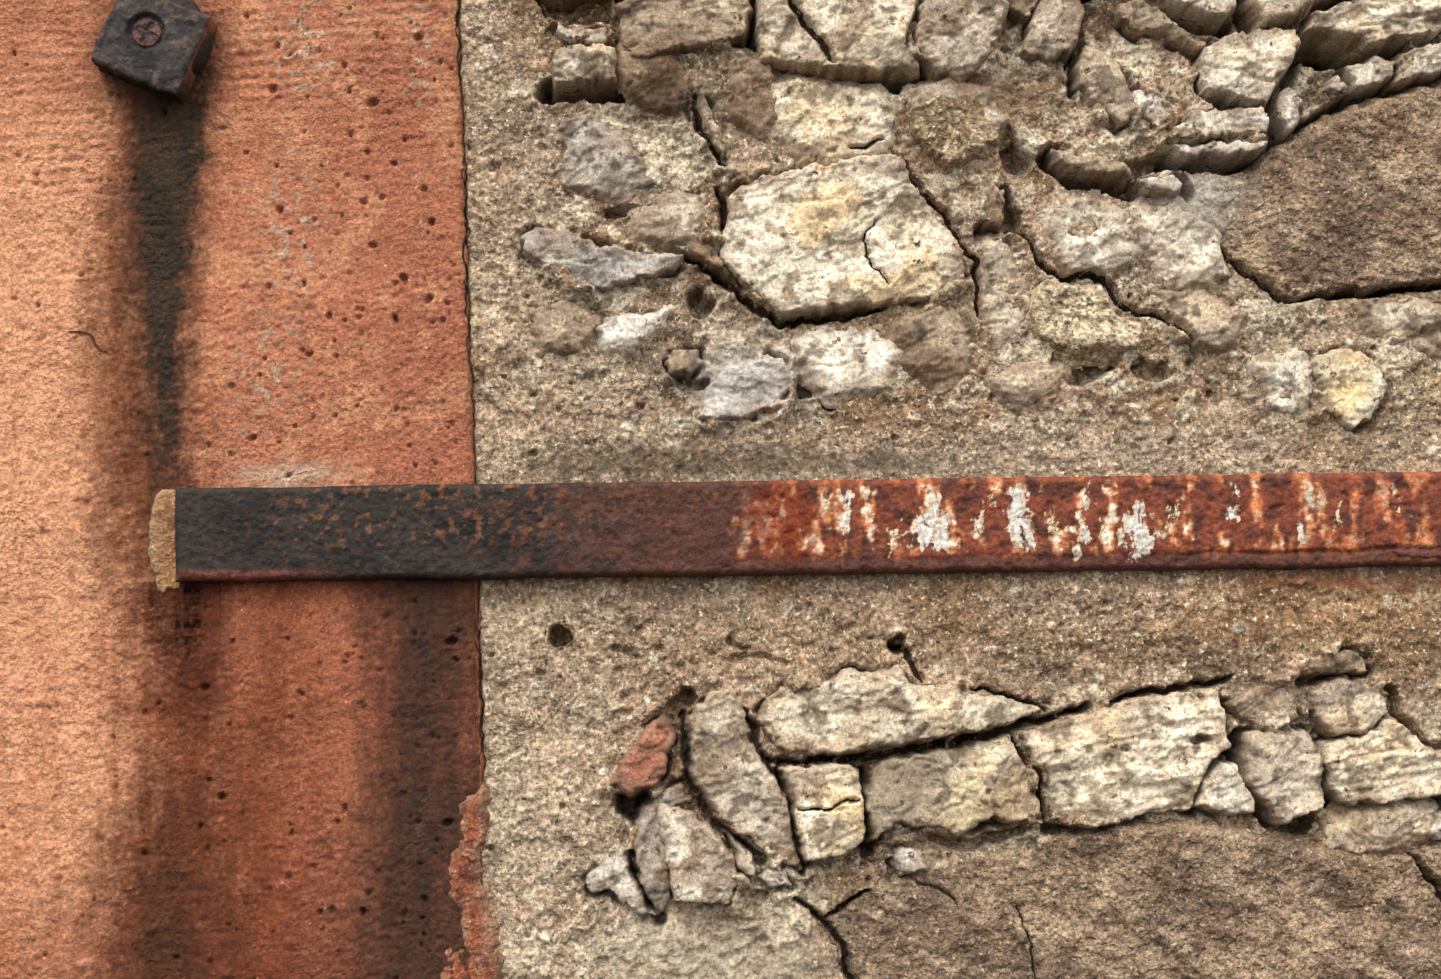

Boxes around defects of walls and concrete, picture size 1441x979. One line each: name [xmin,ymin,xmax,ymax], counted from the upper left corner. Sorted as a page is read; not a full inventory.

corrosion [1390,544,1441,559]
leakage [352,579,480,979]
spalling [440,780,504,979]
crack [1408,854,1441,901]
crack [794,889,868,979]